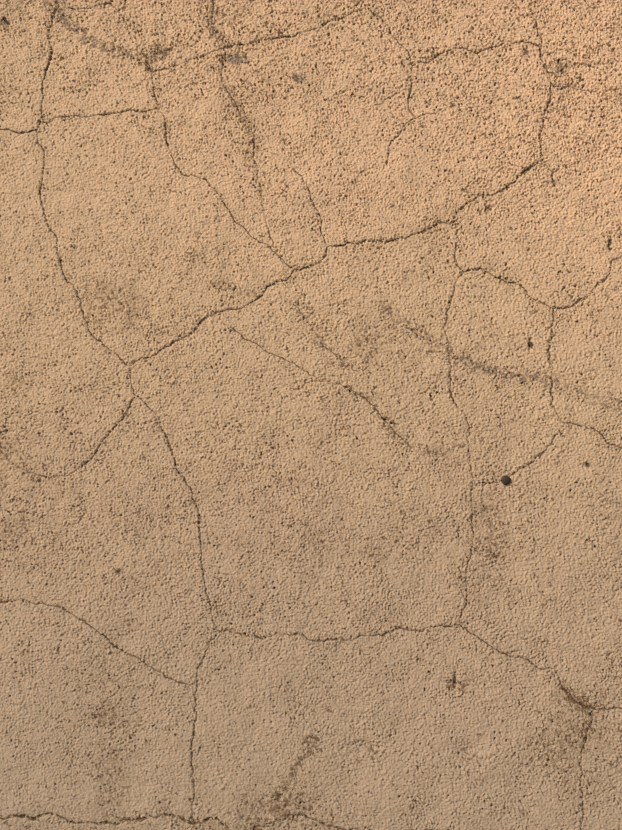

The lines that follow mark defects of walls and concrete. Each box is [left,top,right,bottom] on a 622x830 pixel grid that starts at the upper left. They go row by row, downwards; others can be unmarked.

crack [1,0,621,642]
crack [0,600,229,828]
crack [253,814,346,830]
crack [356,586,620,743]